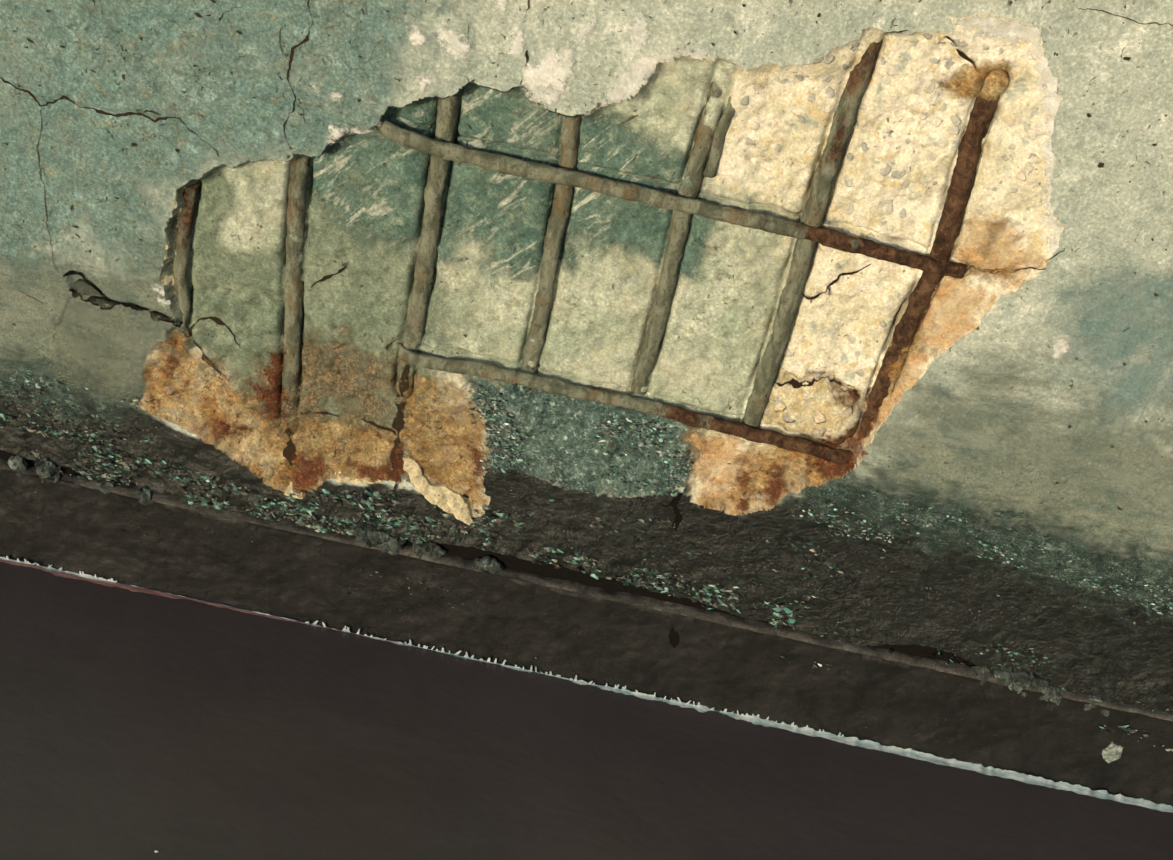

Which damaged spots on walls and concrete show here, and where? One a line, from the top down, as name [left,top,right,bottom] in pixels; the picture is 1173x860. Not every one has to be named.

crack [279,0,313,146]
corrosion [938,61,1012,100]
crack [1,78,240,377]
spalling [141,162,245,395]
spalling [188,428,238,459]
corrosion [139,327,487,511]
crack [309,262,348,292]
spalling [260,13,1065,525]
corrosion [684,220,1046,515]